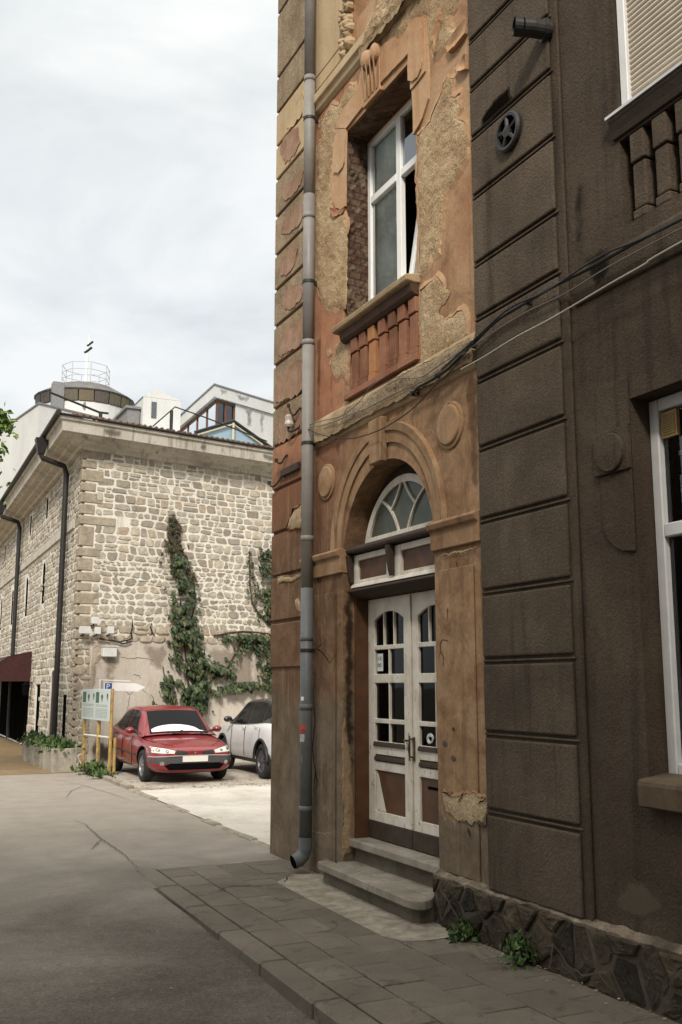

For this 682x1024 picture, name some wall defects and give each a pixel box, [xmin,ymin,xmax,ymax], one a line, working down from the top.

spalling [275,81,358,444]
spalling [314,0,473,443]
crack [78,821,135,865]
spalling [442,789,488,827]